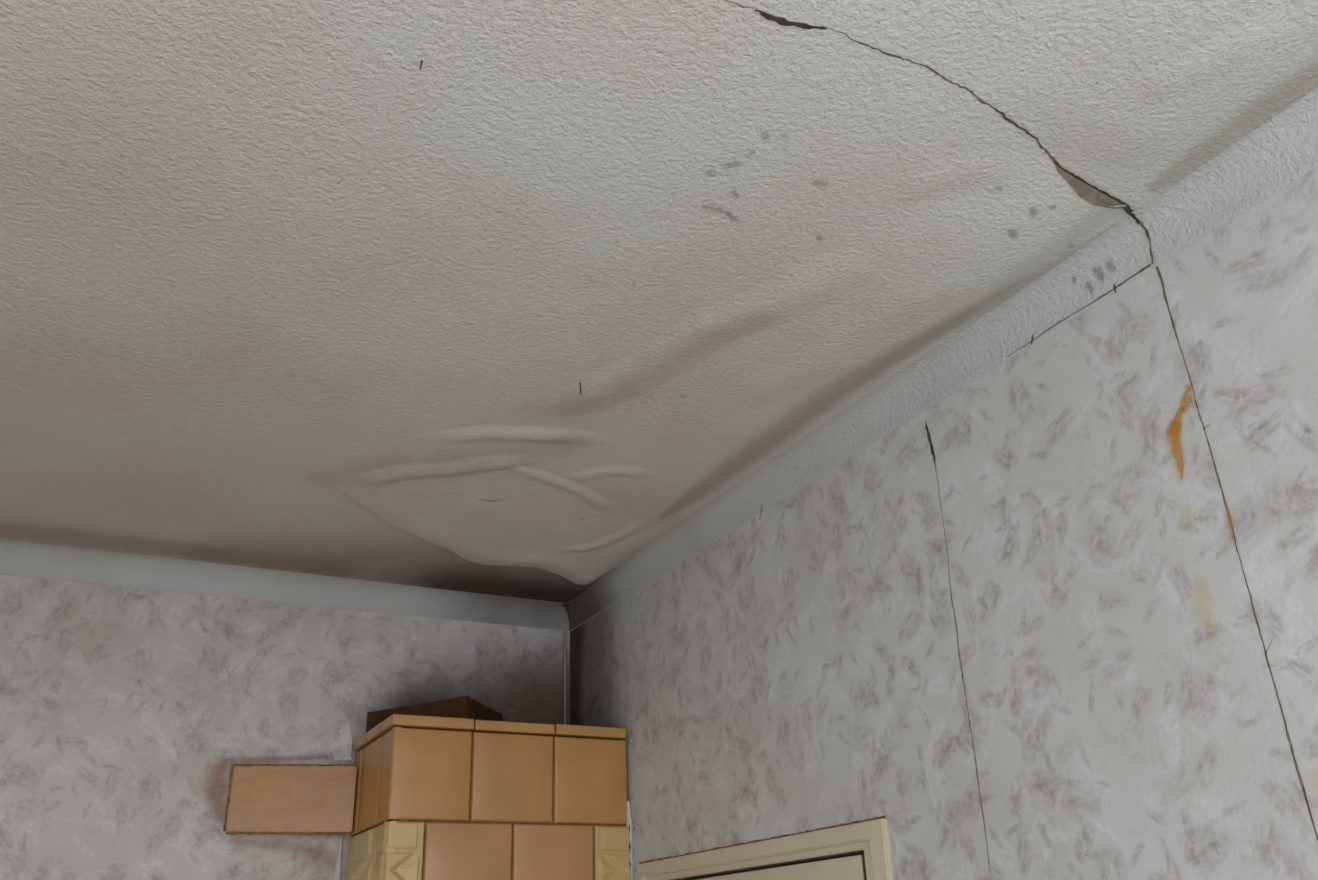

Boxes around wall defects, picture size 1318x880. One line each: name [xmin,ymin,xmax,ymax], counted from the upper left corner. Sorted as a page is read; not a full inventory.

crack [725,0,1318,873]